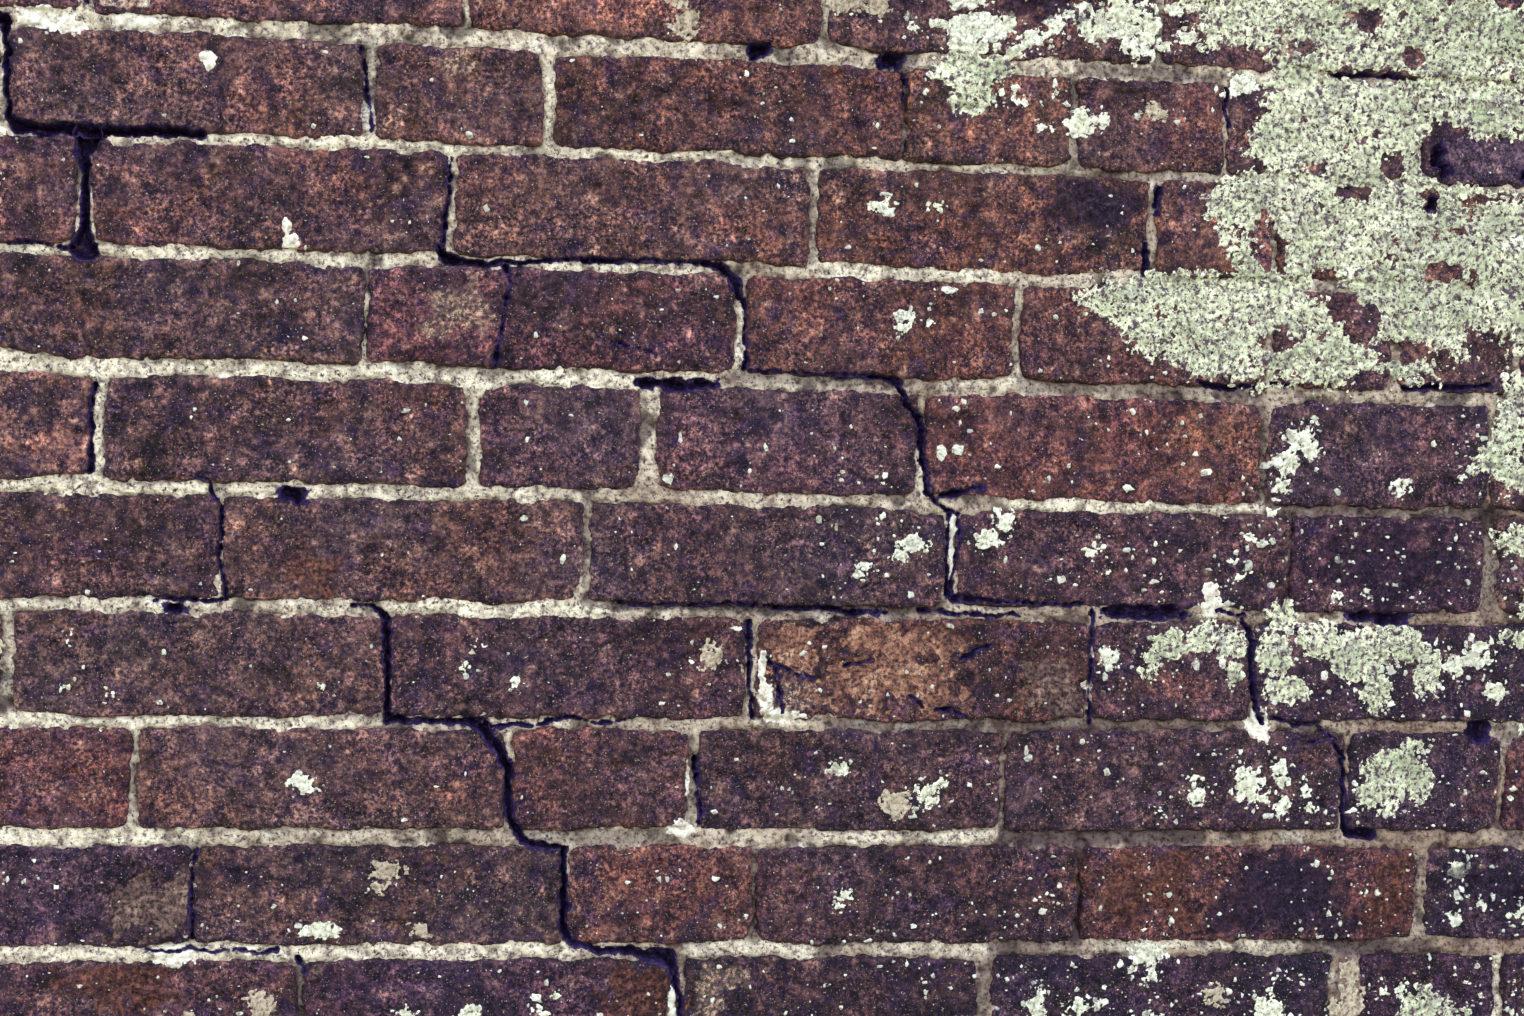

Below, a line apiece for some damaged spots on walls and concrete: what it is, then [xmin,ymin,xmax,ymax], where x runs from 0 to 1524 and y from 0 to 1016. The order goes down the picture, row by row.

crack [0,11,207,263]
crack [435,156,1096,725]
crack [350,603,685,1016]
crack [691,755,705,825]